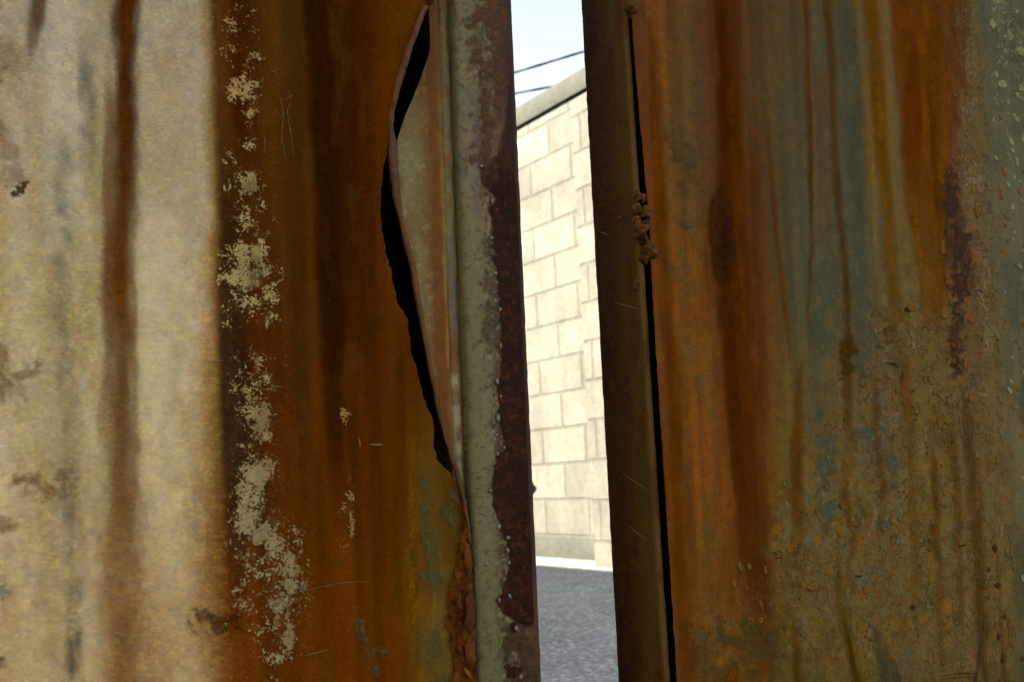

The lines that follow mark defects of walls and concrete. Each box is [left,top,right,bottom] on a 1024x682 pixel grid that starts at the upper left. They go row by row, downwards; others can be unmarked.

rust [11,180,29,197]
rust [31,0,45,35]
rust [104,0,139,529]
peeling [211,4,284,329]
rust [462,0,504,167]
rust [709,191,736,281]
rust [839,235,858,396]
rust [866,0,961,307]
peeling [223,345,318,682]
rust [445,521,477,682]
rust [502,625,536,682]
rust [837,587,864,682]